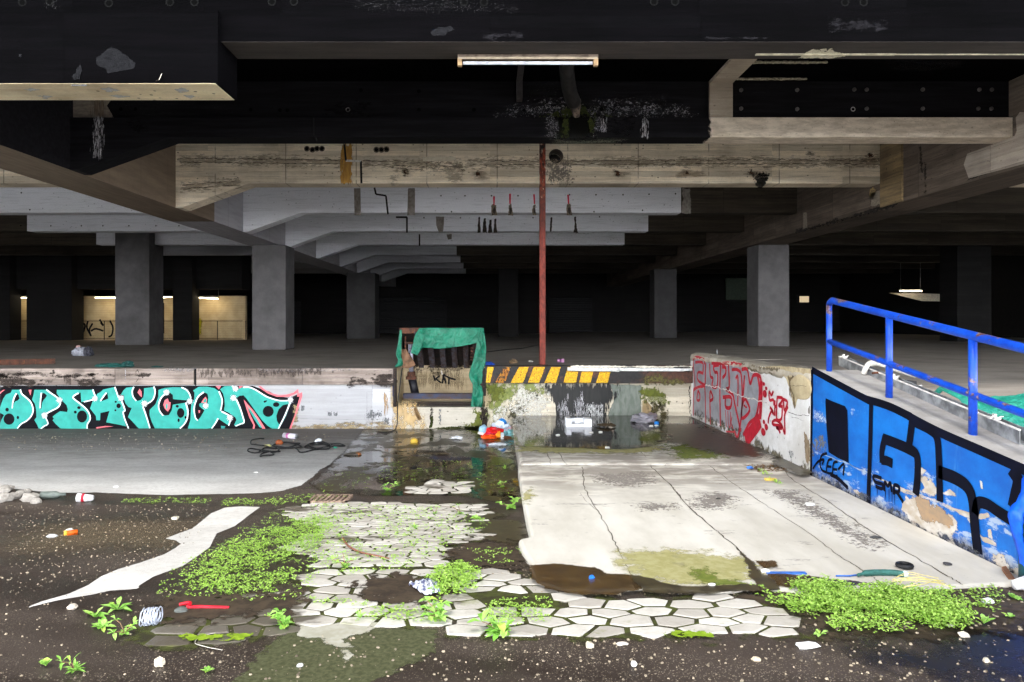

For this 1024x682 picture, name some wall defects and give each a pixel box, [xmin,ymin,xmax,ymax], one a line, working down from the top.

peeling [96,47,135,73]
damp [497,81,693,144]
rust [340,144,353,184]
damp [490,383,621,425]
spalling [759,366,827,464]
crack [519,452,630,573]
crack [618,452,742,552]
peeling [872,467,1018,575]